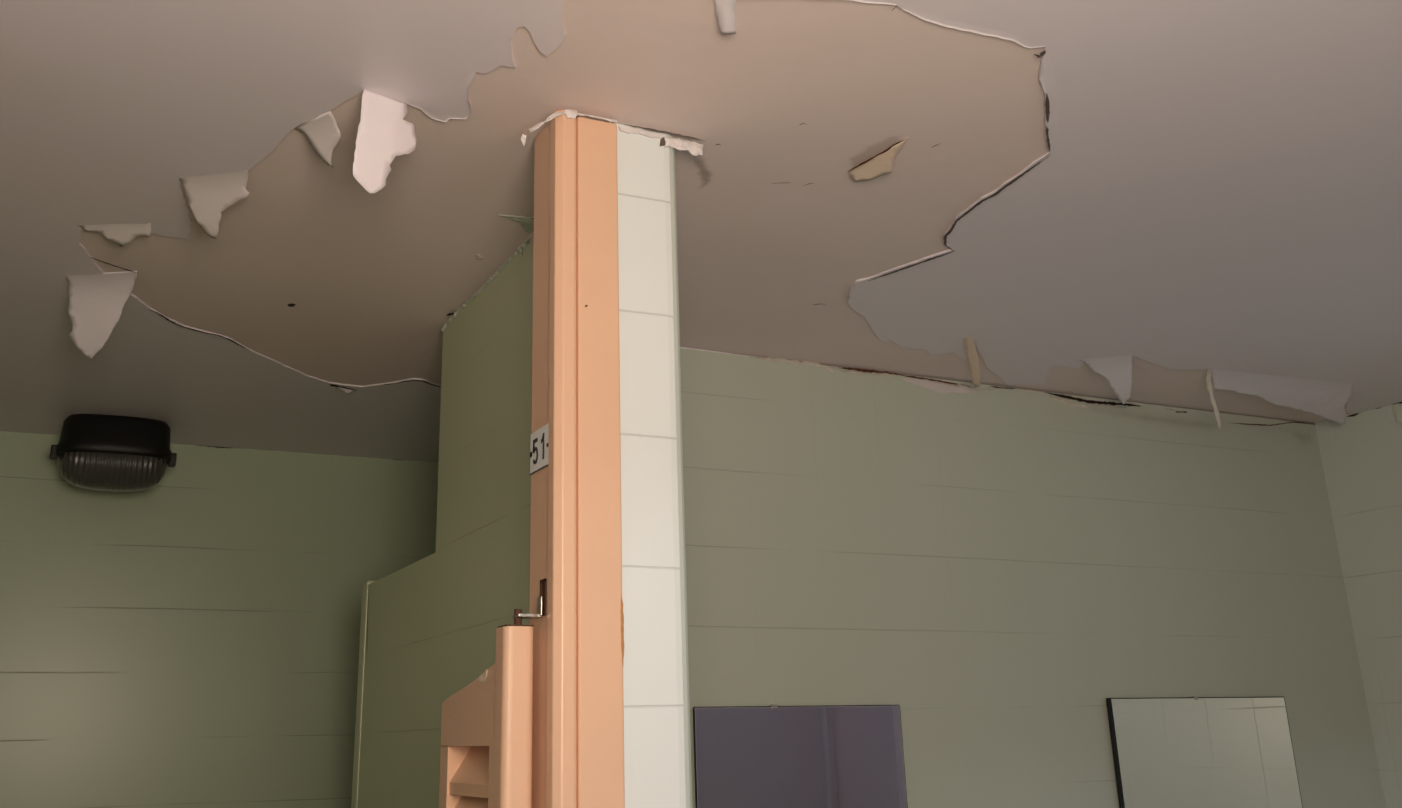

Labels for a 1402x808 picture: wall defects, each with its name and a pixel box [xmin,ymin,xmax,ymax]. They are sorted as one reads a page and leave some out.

peeling [66,0,1353,430]